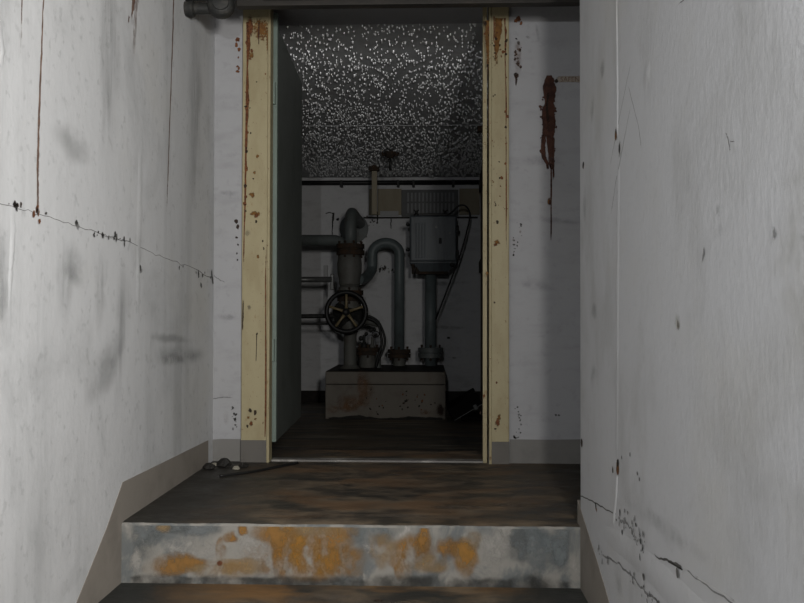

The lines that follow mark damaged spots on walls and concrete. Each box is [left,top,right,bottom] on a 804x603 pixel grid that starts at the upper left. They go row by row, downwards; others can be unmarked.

corrosion [483,16,522,128]
corrosion [234,17,268,262]
corrosion [492,138,508,226]
corrosion [539,75,558,237]
crack [0,200,224,283]
corrosion [246,265,267,434]
corrosion [155,555,205,574]
corrosion [219,526,247,542]
corrosion [257,526,360,574]
corrosion [380,528,476,572]
crack [580,495,733,603]